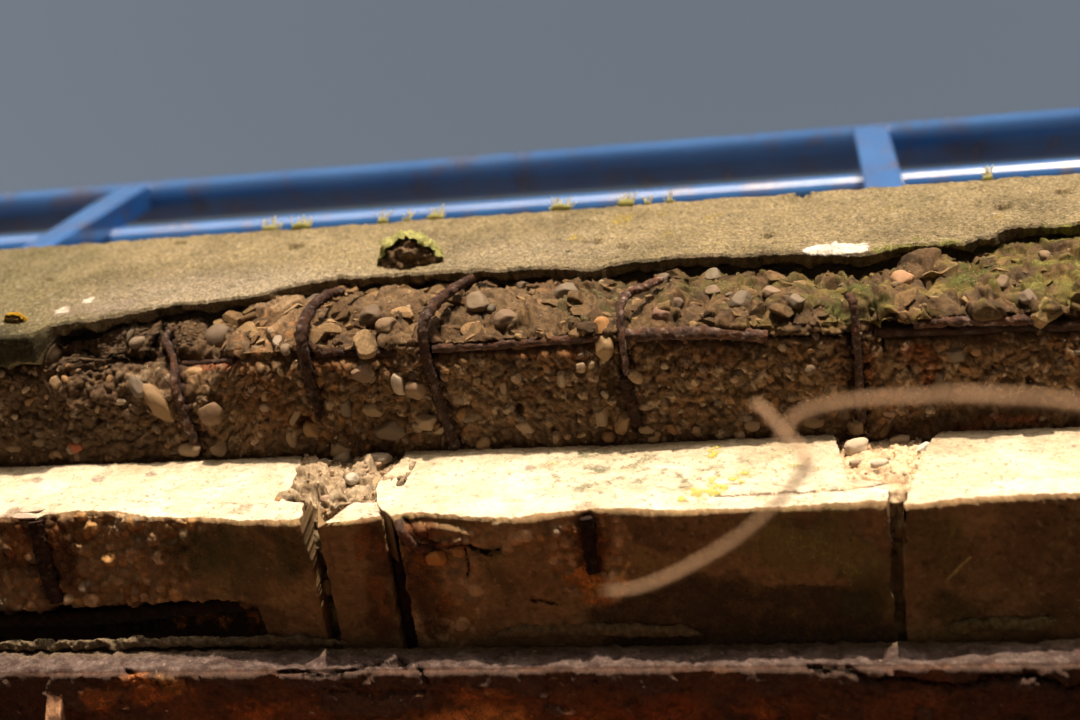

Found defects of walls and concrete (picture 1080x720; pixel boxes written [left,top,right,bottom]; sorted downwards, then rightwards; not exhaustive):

corrosion [170,336,206,457]
corrosion [614,341,646,436]
corrosion [843,323,873,437]
spalling [0,237,1080,650]
corrosion [0,511,258,628]
crack [402,517,500,576]
corrosion [563,516,612,605]
leakage [589,572,898,647]
corrosion [80,673,193,710]
corrosion [429,691,526,720]
crack [810,666,1080,689]